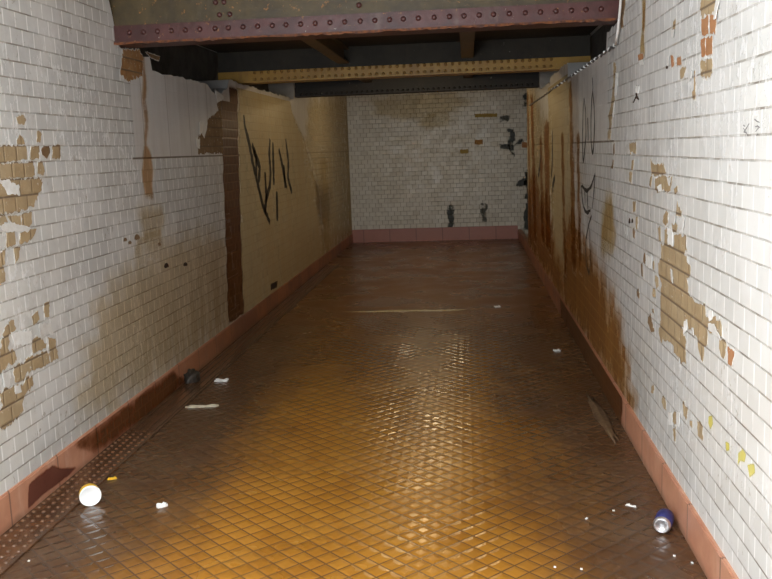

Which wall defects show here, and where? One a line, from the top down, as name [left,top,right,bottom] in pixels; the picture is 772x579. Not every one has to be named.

rust [114,18,617,45]
peeling [666,0,720,101]
peeling [0,113,61,285]
peeling [641,158,735,368]
peeling [0,300,59,431]